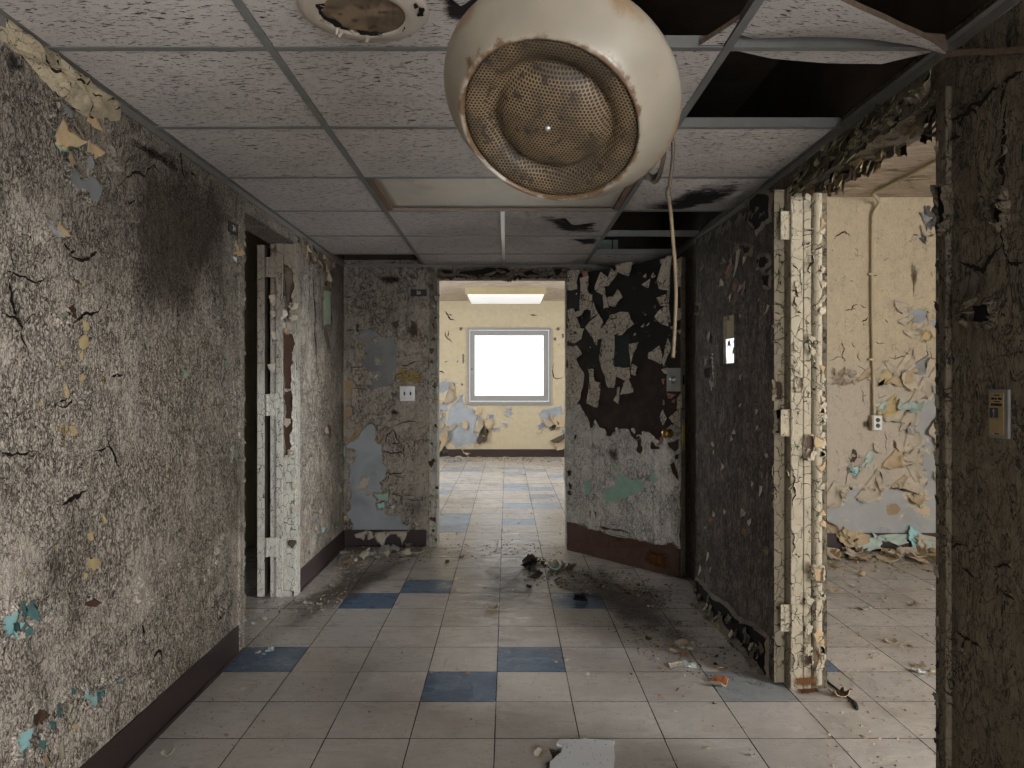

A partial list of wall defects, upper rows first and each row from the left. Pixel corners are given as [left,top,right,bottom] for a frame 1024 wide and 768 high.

peeling [43,97,123,207]
peeling [789,66,939,198]
peeling [913,183,955,245]
crack [0,227,102,356]
peeling [267,236,337,458]
crack [61,484,89,506]
peeling [288,378,414,557]
peeling [392,190,939,686]
peeling [0,600,57,646]
peeling [10,670,155,767]